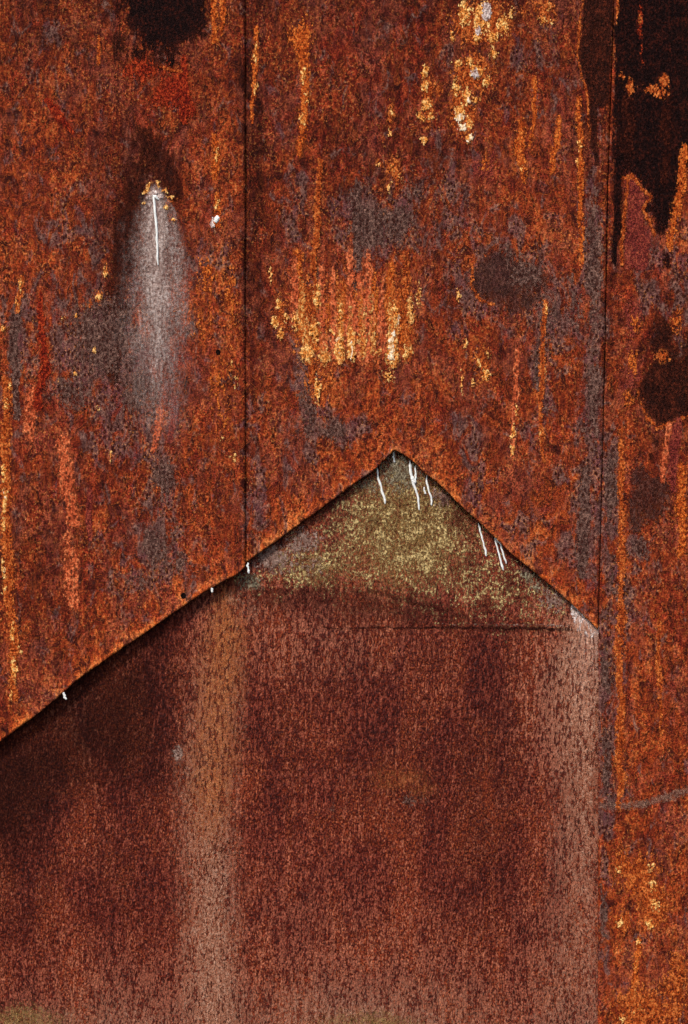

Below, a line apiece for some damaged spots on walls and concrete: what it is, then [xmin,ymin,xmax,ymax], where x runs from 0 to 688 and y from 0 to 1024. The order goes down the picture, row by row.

water stain [111,0,216,74]
rust [618,176,626,216]
water stain [144,190,167,341]
water stain [464,0,688,579]
rust [677,417,688,507]
rust [208,614,235,755]
rust [613,429,628,810]
rust [655,613,663,699]
rust [612,936,688,1024]